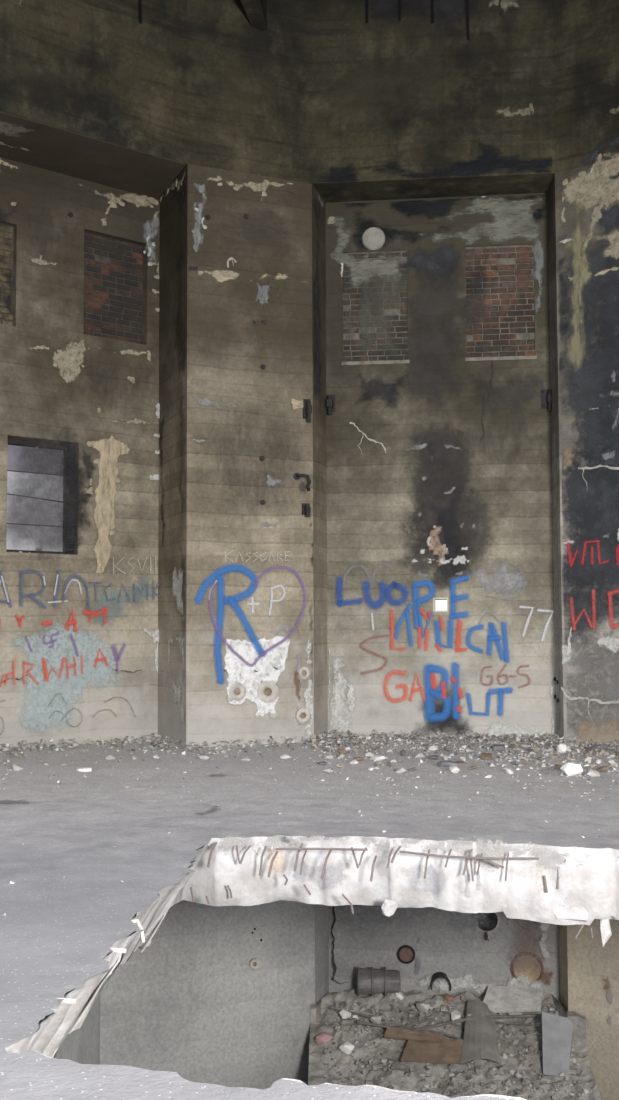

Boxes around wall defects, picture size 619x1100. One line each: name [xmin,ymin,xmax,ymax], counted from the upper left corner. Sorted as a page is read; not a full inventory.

spalling [95,171,293,266]
water stain [560,153,619,369]
flaking render [29,341,89,383]
flaking render [120,349,151,361]
flaking render [86,435,130,573]
crack [349,422,386,453]
crack [578,465,619,484]
spalling [412,525,469,577]
peeling [224,626,313,738]
rust [269,851,283,871]
spalling [2,835,619,1059]
crack [331,906,347,984]